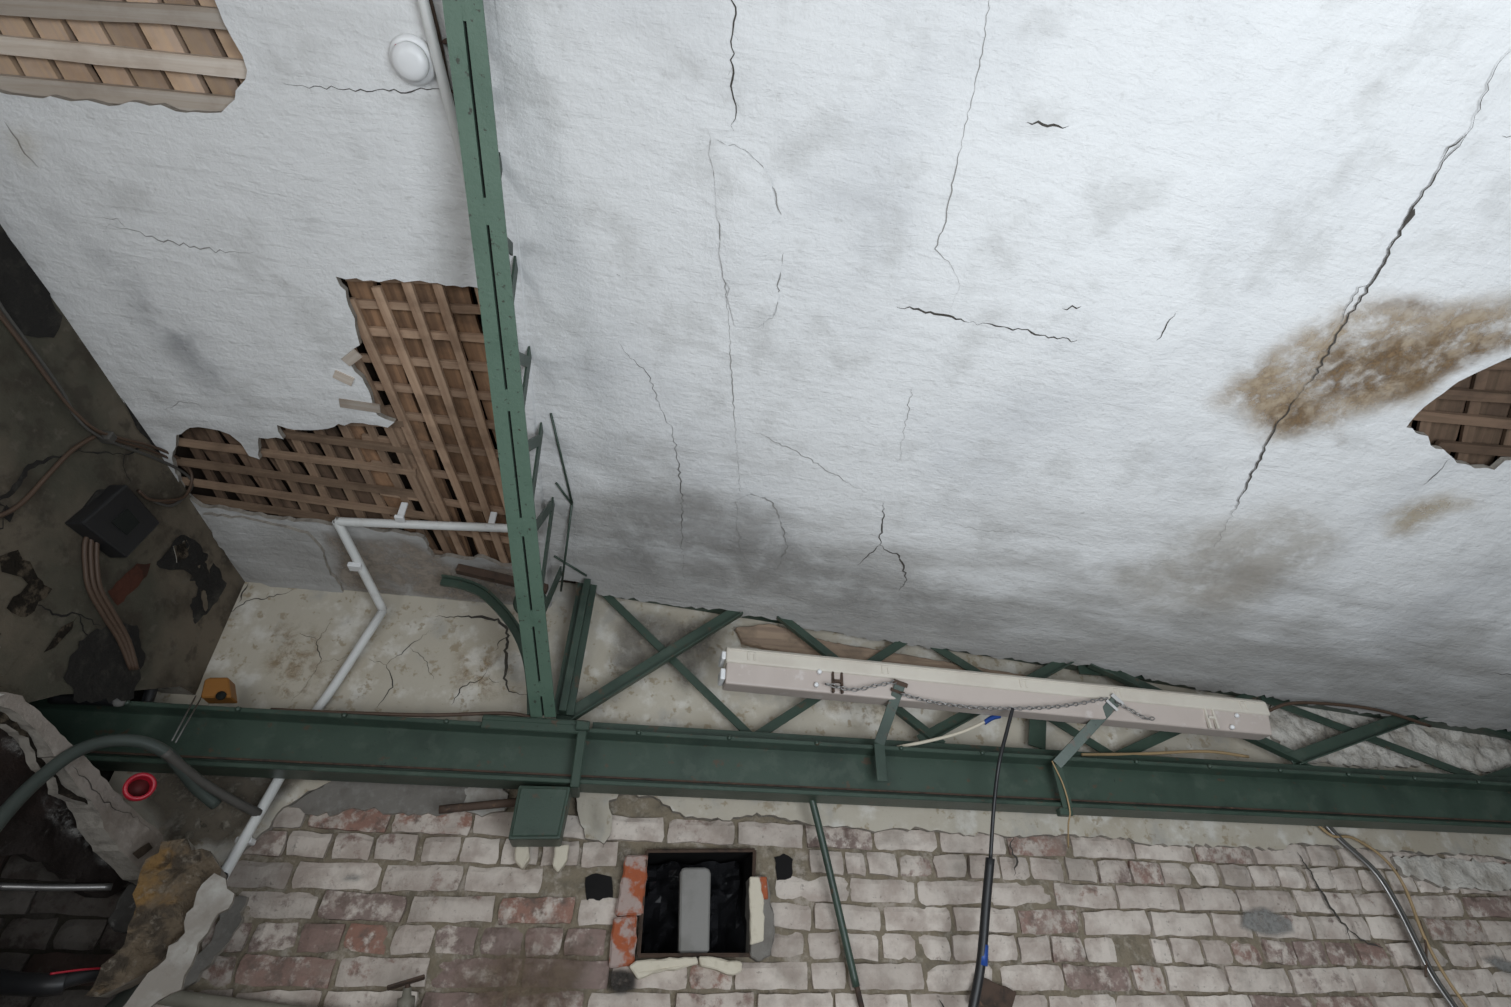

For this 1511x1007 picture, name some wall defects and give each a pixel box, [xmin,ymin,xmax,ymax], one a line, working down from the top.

flaking render [0,0,247,111]
crack [710,0,737,139]
crack [900,2,1080,342]
flaking render [176,278,512,563]
crack [723,279,907,590]
crack [1214,57,1511,547]
water stain [1236,307,1511,434]
flaking render [1408,357,1511,466]
crack [295,615,527,709]
spalling [759,854,793,899]